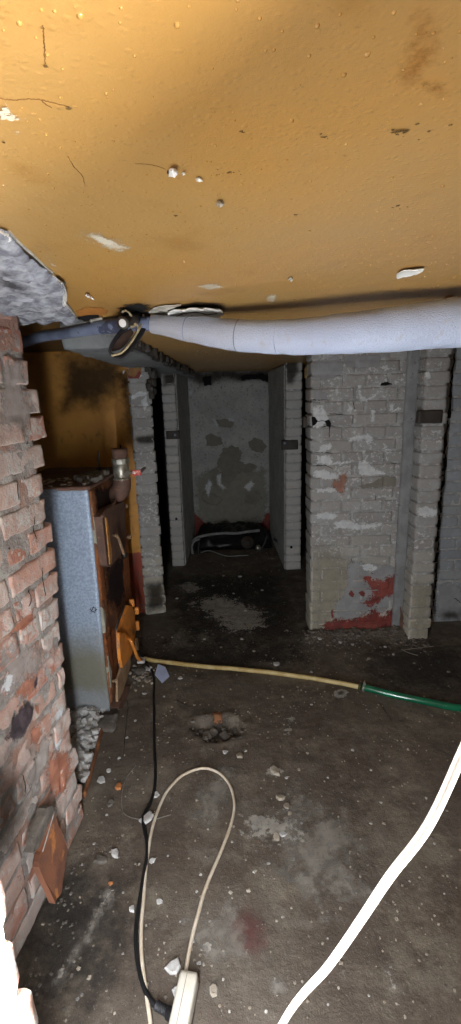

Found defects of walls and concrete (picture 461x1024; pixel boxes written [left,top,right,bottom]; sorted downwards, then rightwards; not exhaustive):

crack [40,25,48,68]
crack [0,98,71,110]
spalling [0,229,108,326]
peeling [396,268,424,279]
peeling [311,405,396,493]
peeling [322,564,404,630]